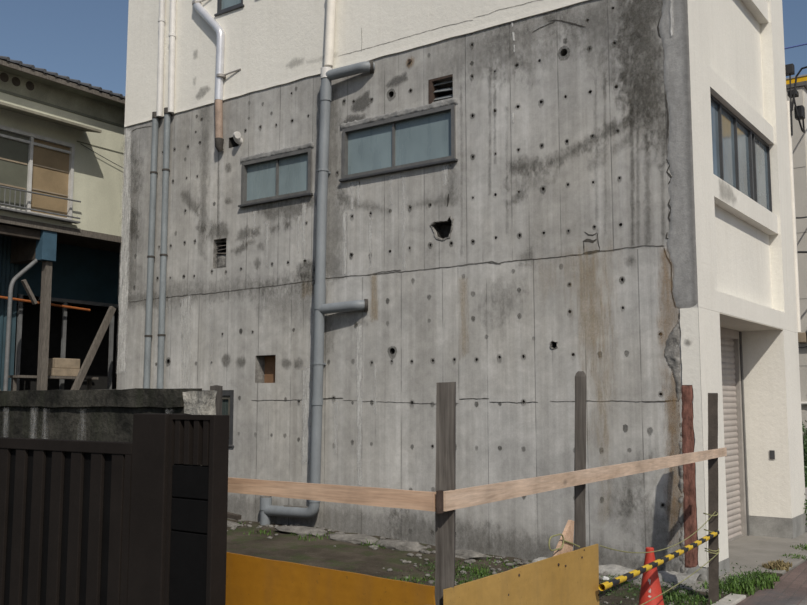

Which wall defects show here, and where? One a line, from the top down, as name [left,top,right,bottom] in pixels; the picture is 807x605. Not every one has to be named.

crack [533,20,585,32]
water stain [608,0,674,133]
crack [119,232,663,303]
spalling [430,194,454,242]
spalling [664,233,695,454]
peeling [678,462,698,573]